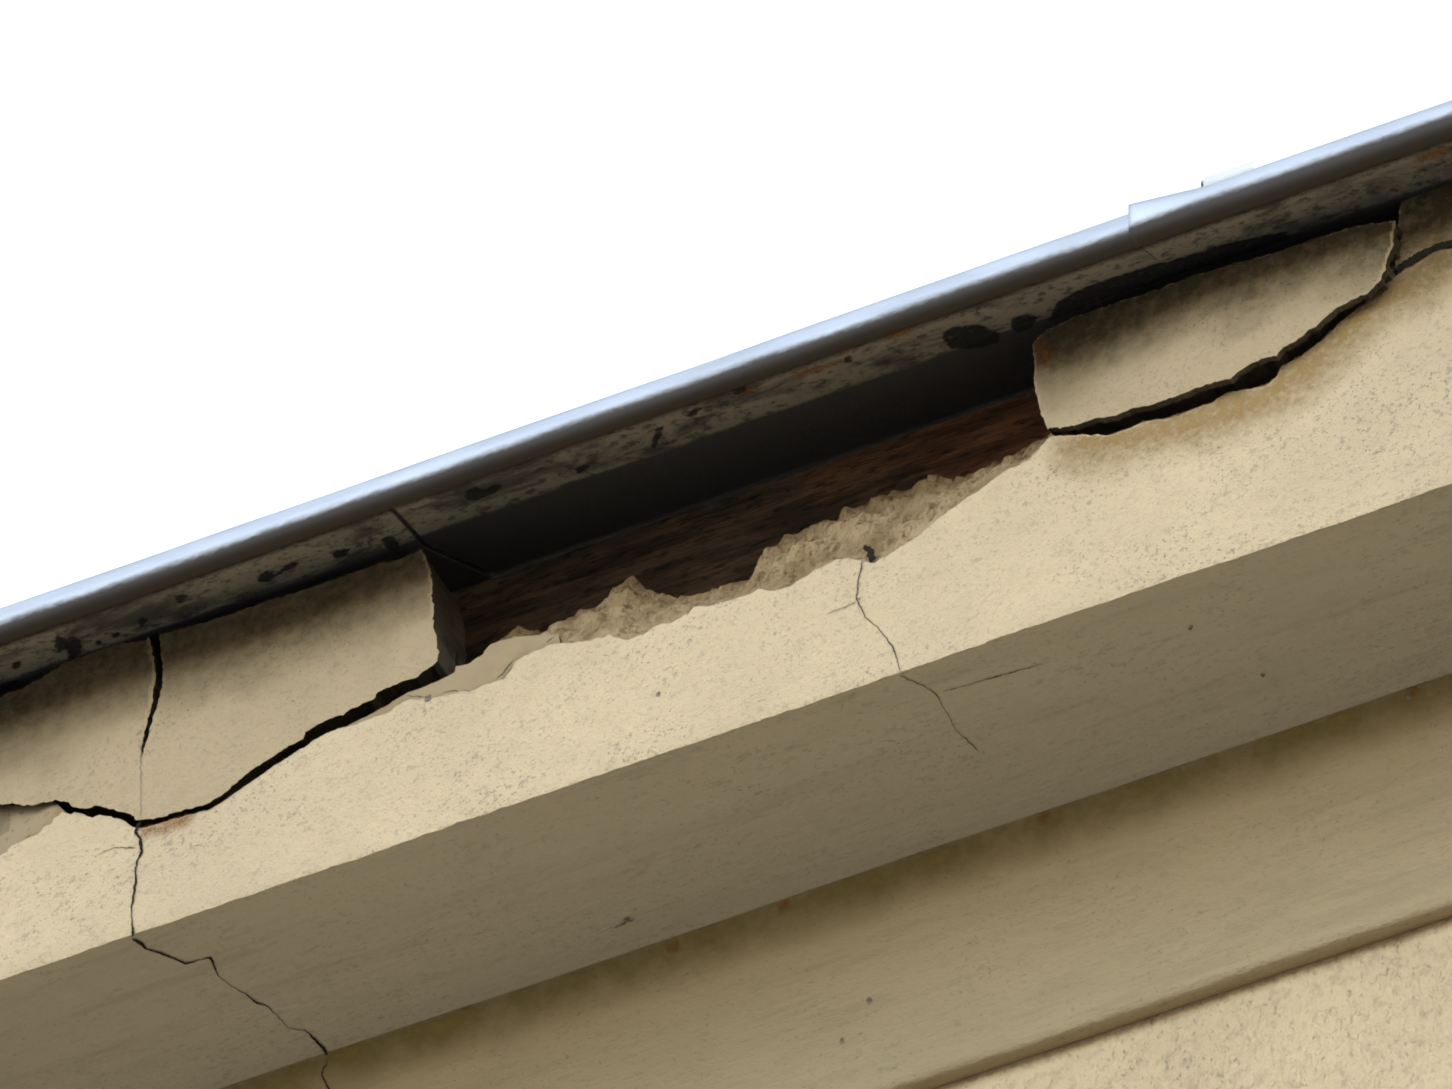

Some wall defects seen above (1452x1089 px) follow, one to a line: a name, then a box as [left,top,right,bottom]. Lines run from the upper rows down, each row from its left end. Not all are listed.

crack [1395,239,1452,270]
peeling [943,233,1291,349]
peeling [257,562,298,582]
spalling [342,433,1054,728]
peeling [0,662,21,694]
peeling [55,633,120,659]
crack [827,560,1042,751]
spalling [0,801,66,855]
crack [102,745,330,1089]